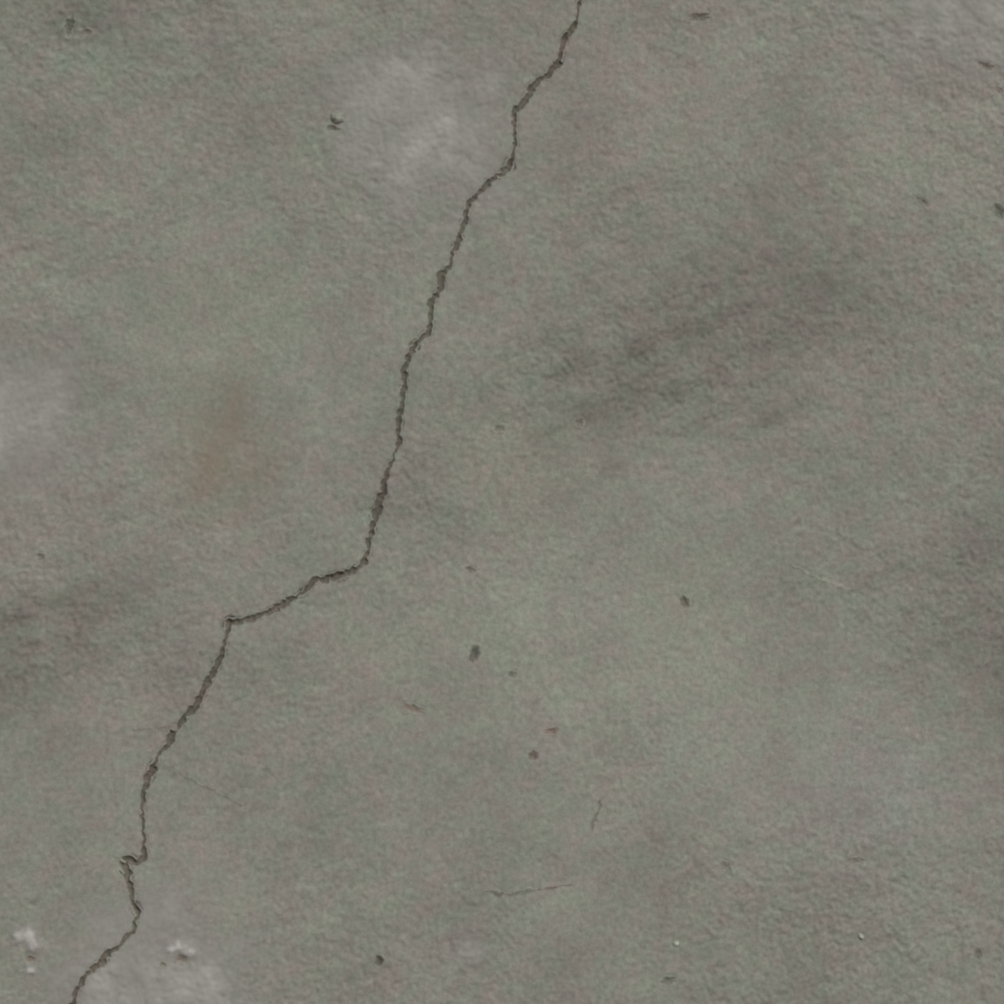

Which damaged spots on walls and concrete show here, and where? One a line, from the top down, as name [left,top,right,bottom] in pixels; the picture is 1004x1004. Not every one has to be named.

crack [67,0,584,1004]
crack [590,800,603,831]